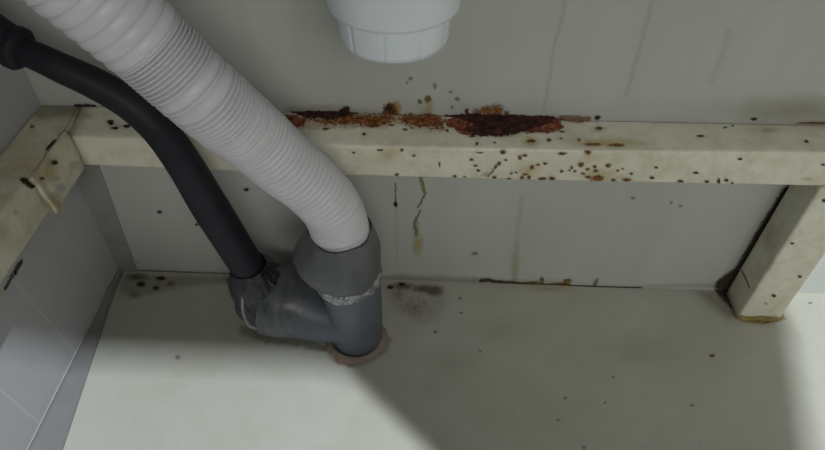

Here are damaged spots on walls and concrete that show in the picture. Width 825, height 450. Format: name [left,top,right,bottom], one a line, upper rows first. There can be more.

corrosion [285,91,602,179]
corrosion [507,138,633,182]
corrosion [414,177,426,249]
damp [132,270,228,290]
corrosion [479,278,571,286]